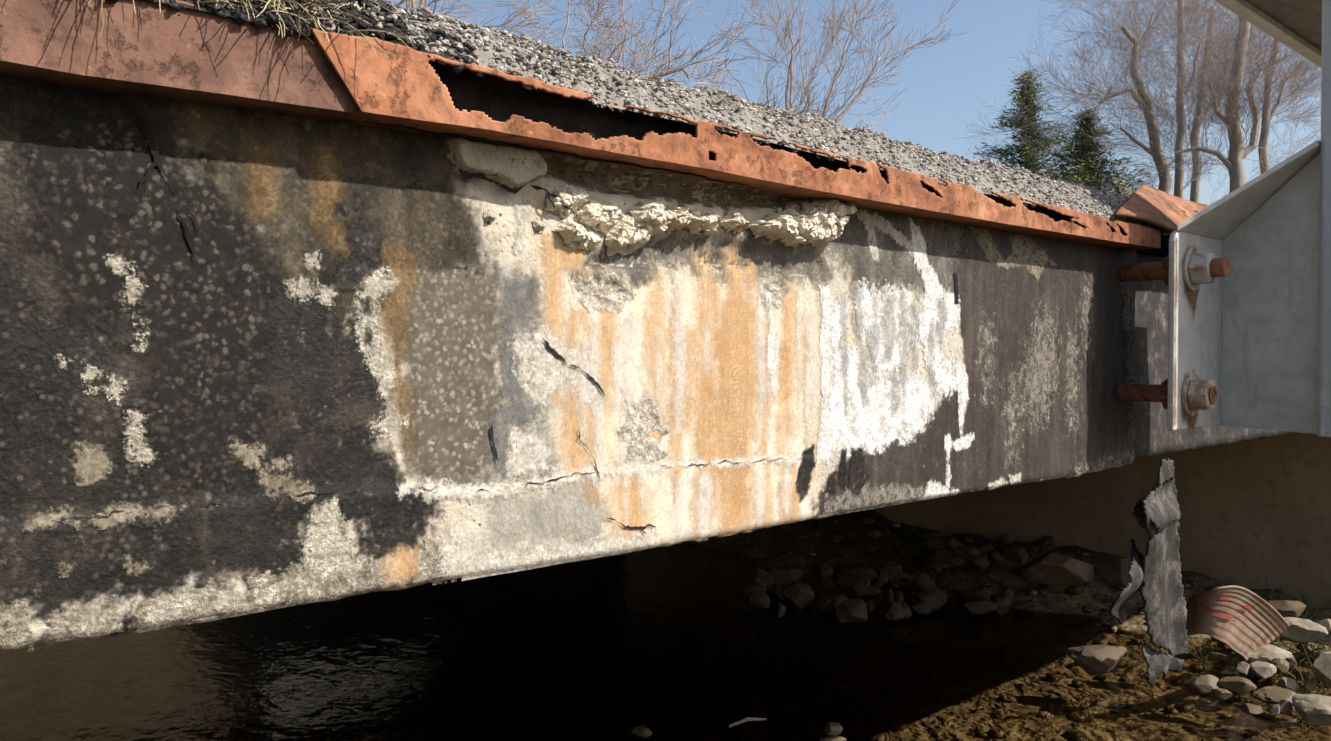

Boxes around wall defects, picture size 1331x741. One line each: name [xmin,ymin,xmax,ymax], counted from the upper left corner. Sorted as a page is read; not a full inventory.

corrosion [243,131,278,218]
corrosion [308,140,345,248]
spalling [540,153,857,318]
corrosion [377,248,416,447]
damp [0,76,1136,637]
crack [543,339,607,396]
corrosion [545,235,823,553]
crack [4,425,791,525]
crack [606,518,655,534]